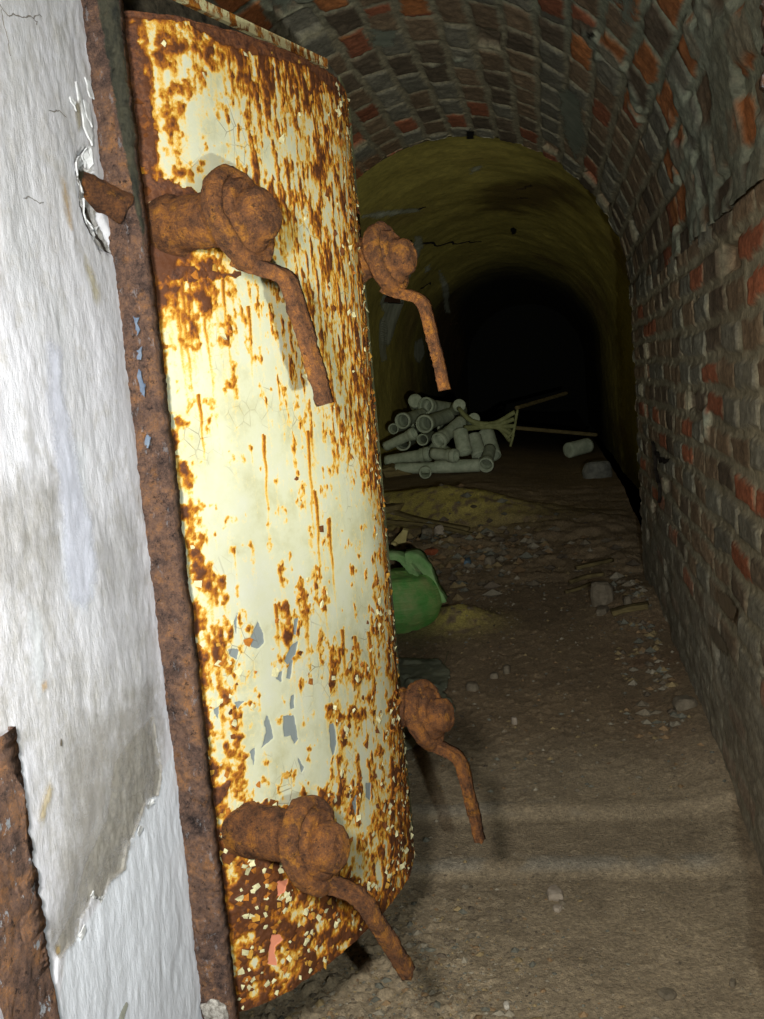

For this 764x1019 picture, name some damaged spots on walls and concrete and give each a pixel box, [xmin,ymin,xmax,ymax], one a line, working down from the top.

crack [0,4,41,56]
spalling [69,77,111,253]
crack [410,239,481,247]
peeling [309,77,415,910]
peeling [203,660,257,739]
peeling [55,711,162,958]
peeling [219,833,364,1010]